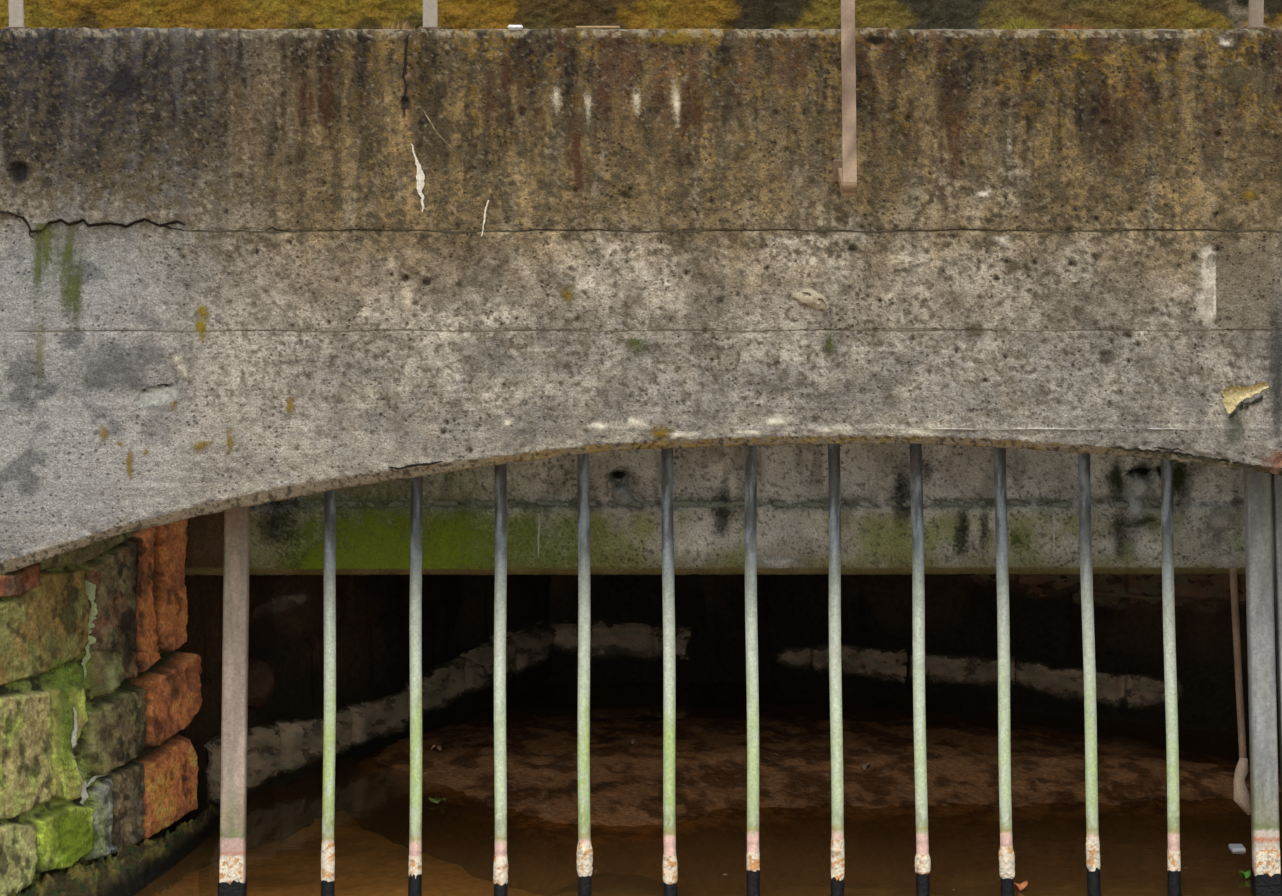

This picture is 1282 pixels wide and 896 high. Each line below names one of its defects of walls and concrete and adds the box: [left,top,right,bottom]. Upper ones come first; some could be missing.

crack [0,210,1282,238]
leakage [716,488,729,532]
leakage [957,511,986,551]
leakage [763,556,793,567]
leakage [81,580,98,680]
leakage [70,707,110,804]